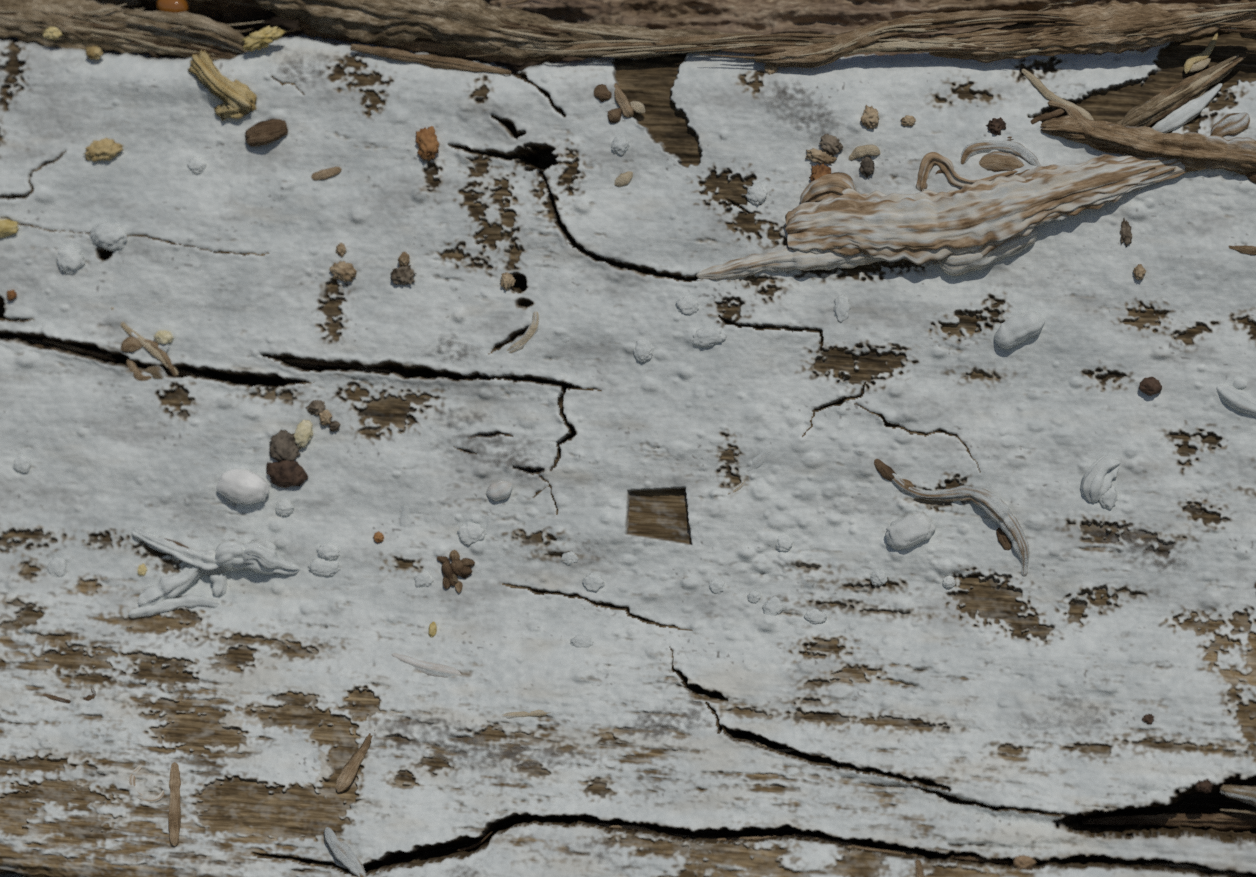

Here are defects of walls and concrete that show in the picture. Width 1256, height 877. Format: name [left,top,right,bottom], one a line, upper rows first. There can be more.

peeling [439,154,525,277]
crack [448,114,699,282]
peeling [612,53,788,247]
crack [718,315,824,351]
crack [0,318,602,515]
crack [802,381,981,473]
peeling [946,568,1147,644]
peeling [0,599,385,877]
crack [502,583,1079,817]
peeling [721,637,950,733]
peeling [1062,608,1256,763]
crack [252,813,1256,877]